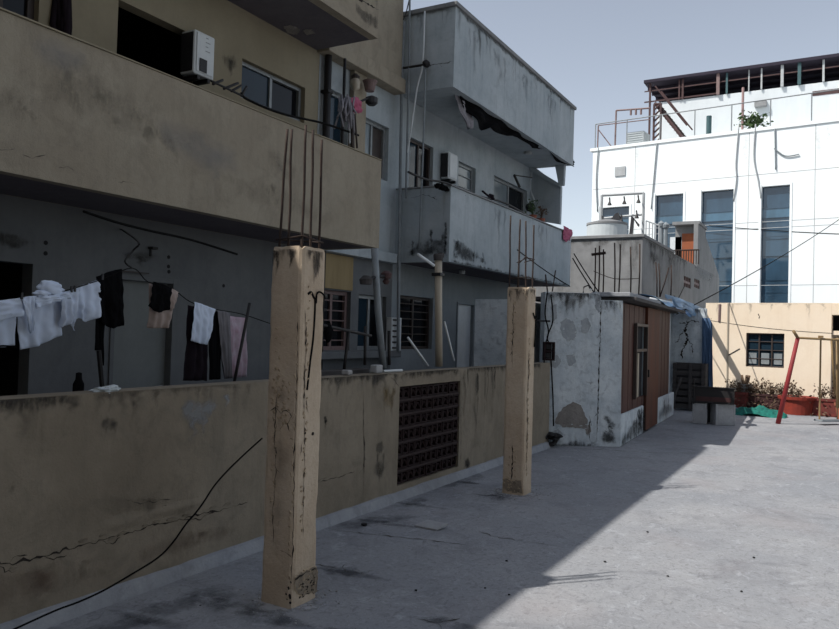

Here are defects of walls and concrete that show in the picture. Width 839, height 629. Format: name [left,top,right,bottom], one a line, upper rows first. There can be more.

water stain [410,223,589,297]
peeling [559,246,606,341]
spalling [614,243,641,295]
crack [675,320,699,358]
crack [269,286,372,588]
spalling [552,402,592,442]
mould [603,408,645,444]
crack [0,499,247,573]
spalling [285,565,318,604]